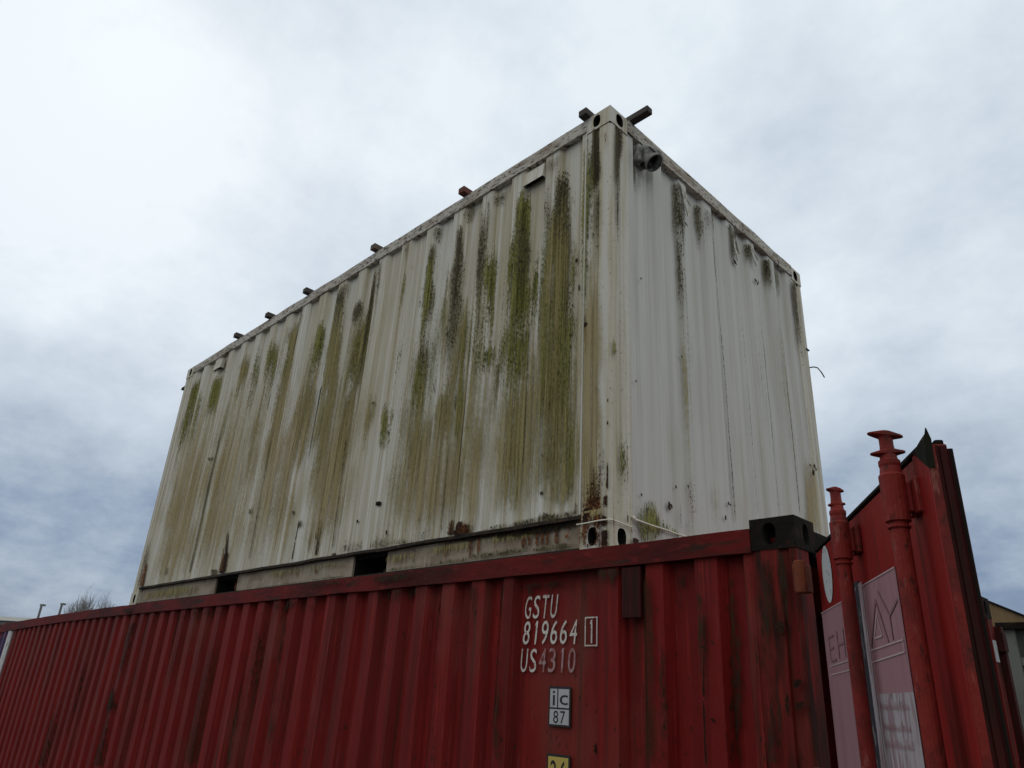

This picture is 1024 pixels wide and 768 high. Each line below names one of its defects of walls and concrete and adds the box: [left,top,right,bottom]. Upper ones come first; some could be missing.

leakage [142,263,381,598]
leakage [388,129,601,529]
rust [428,285,614,565]